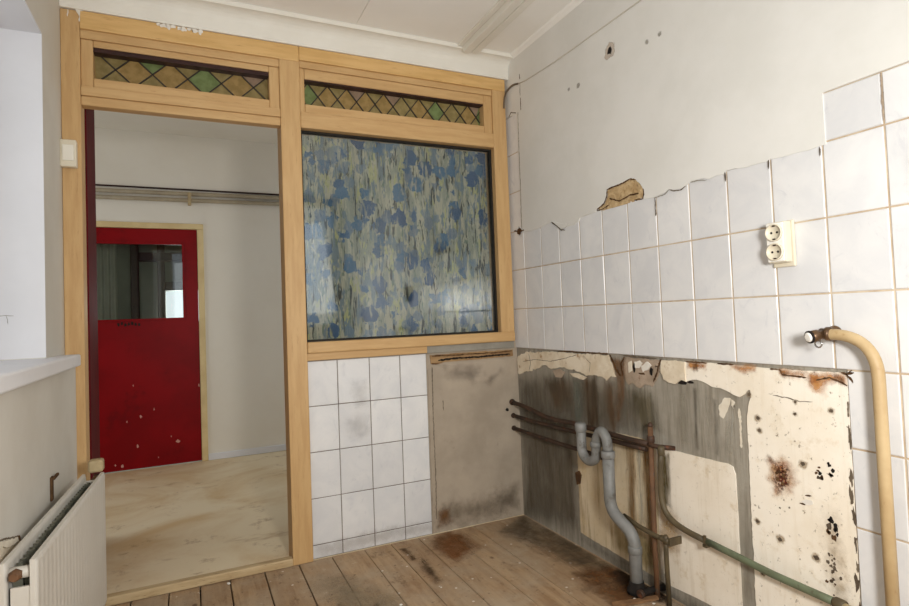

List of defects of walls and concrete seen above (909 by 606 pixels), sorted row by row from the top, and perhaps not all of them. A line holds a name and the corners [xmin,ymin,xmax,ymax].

flaking render [597,178,644,211]
peeling [430,350,694,388]
corrosion [770,368,847,390]
water stain [506,380,666,603]
corrosion [770,459,790,492]
peeling [826,516,839,541]
water stain [435,534,470,558]
peeling [812,553,842,596]